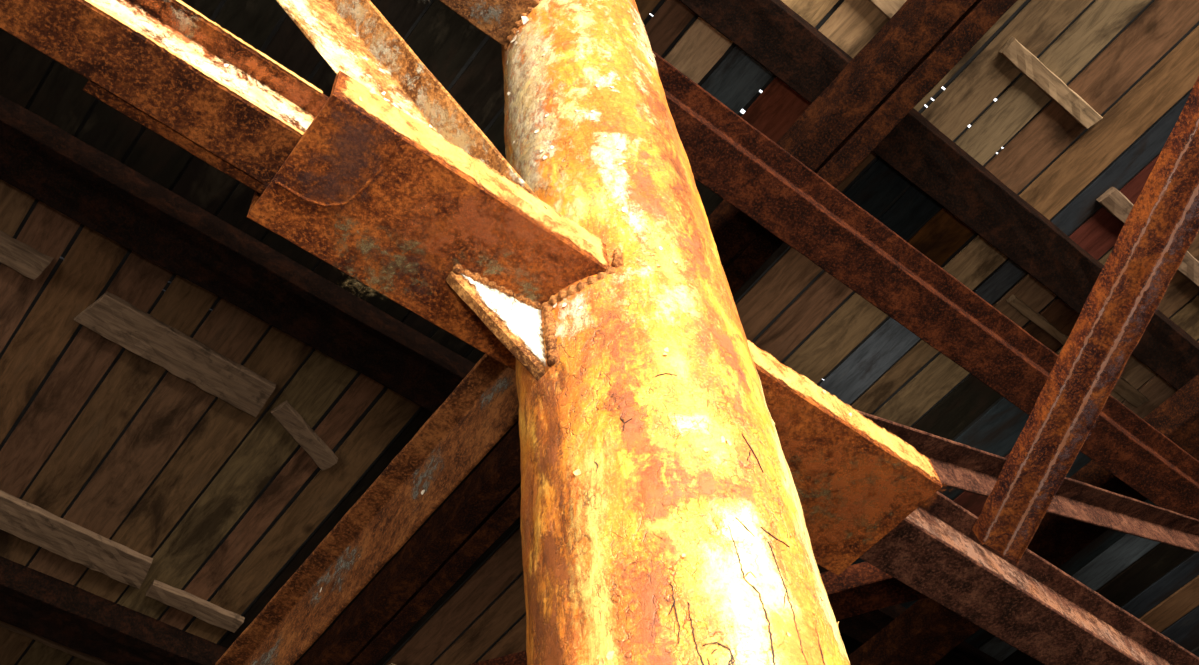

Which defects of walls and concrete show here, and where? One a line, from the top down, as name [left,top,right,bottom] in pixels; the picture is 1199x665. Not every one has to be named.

rust [86,0,329,135]
rust [537,0,709,279]
rust [404,191,593,293]
rust [983,118,1199,555]
rust [598,309,755,521]
rust [525,365,582,665]
rust [614,534,681,665]
crack [669,580,735,665]
crack [728,517,825,665]
rust [765,525,823,665]